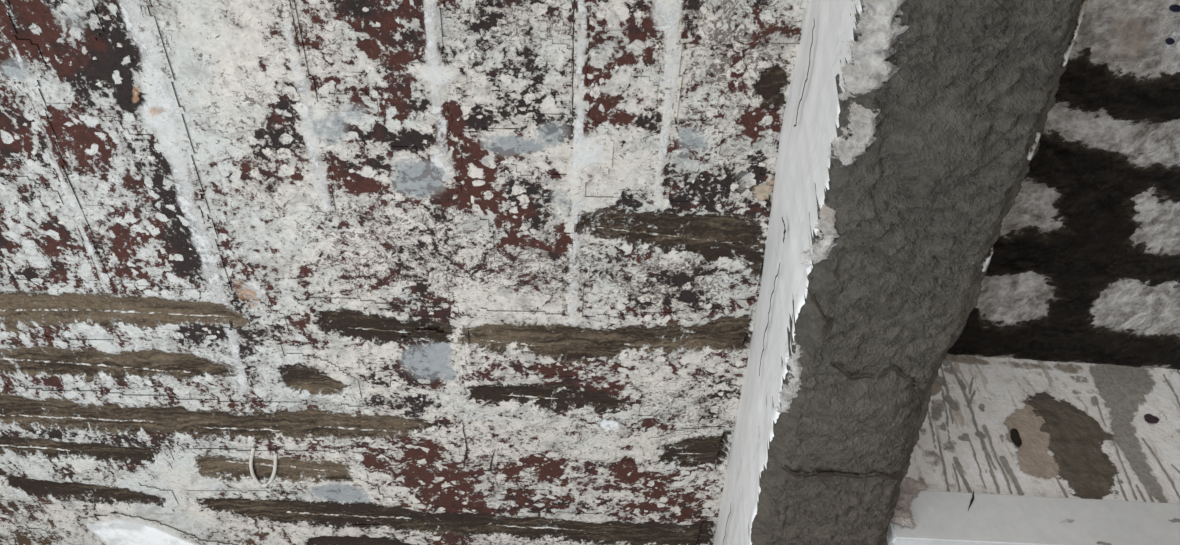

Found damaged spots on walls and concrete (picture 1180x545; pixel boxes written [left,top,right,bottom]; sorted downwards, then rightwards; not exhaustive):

peeling [0,0,201,284]
peeling [247,74,308,188]
peeling [324,0,433,200]
peeling [382,0,575,317]
peeling [586,0,660,151]
peeling [664,0,804,208]
peeling [161,326,225,350]
peeling [582,254,733,314]
peeling [0,495,59,545]
peeling [0,464,154,483]
flaking render [74,514,293,545]
peeling [343,353,727,517]